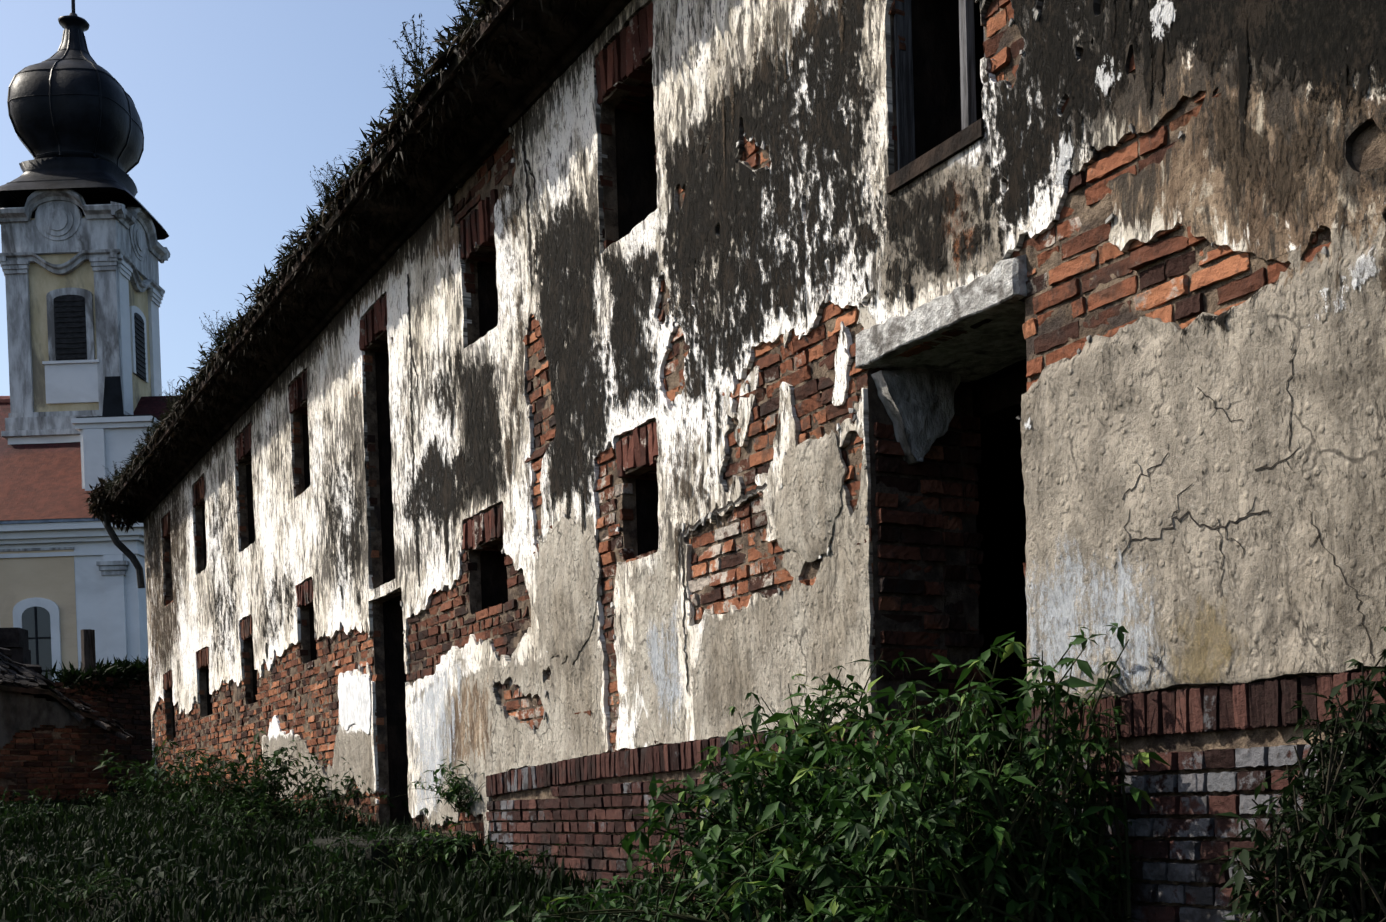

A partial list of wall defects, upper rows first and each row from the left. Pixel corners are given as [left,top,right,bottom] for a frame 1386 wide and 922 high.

flaking render [975,0,1025,88]
damp [403,0,1386,588]
flaking render [1008,88,1331,391]
flaking render [153,314,556,795]
damp [647,607,682,719]
flaking render [682,290,1000,621]
damp [1026,545,1231,691]
crack [1113,330,1300,596]
crack [1309,510,1375,662]
flaking render [280,779,387,830]